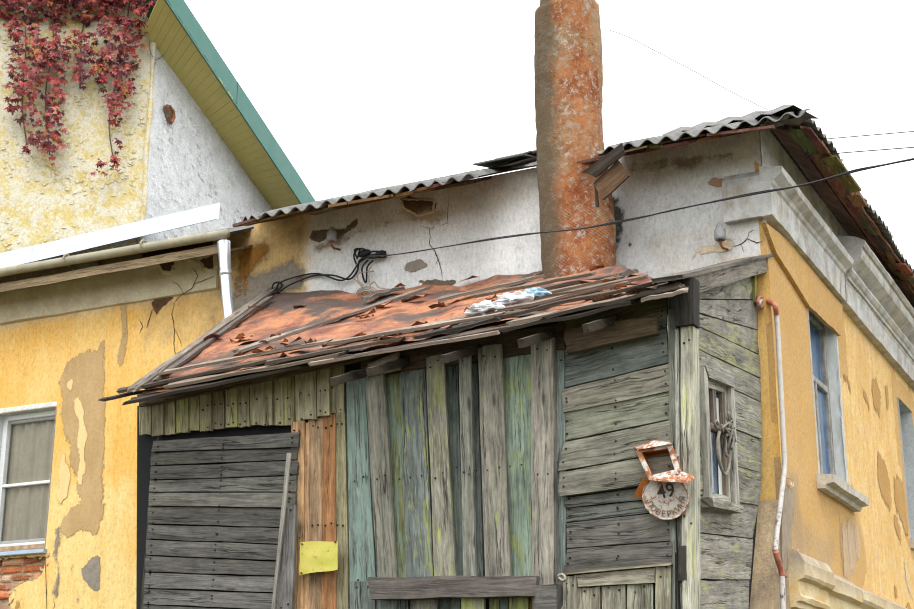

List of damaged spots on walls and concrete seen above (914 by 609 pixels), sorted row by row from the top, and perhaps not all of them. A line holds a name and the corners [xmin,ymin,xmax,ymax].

spalling [73,253,100,279]
spalling [140,224,218,275]
rust [235,242,269,298]
leakage [233,259,305,311]
spalling [310,218,358,242]
leakage [613,197,624,249]
spalling [146,297,173,328]
peeling [863,377,889,418]
peeling [57,340,106,538]
peeling [877,451,909,545]
spalling [0,543,50,609]
spalling [81,556,101,591]